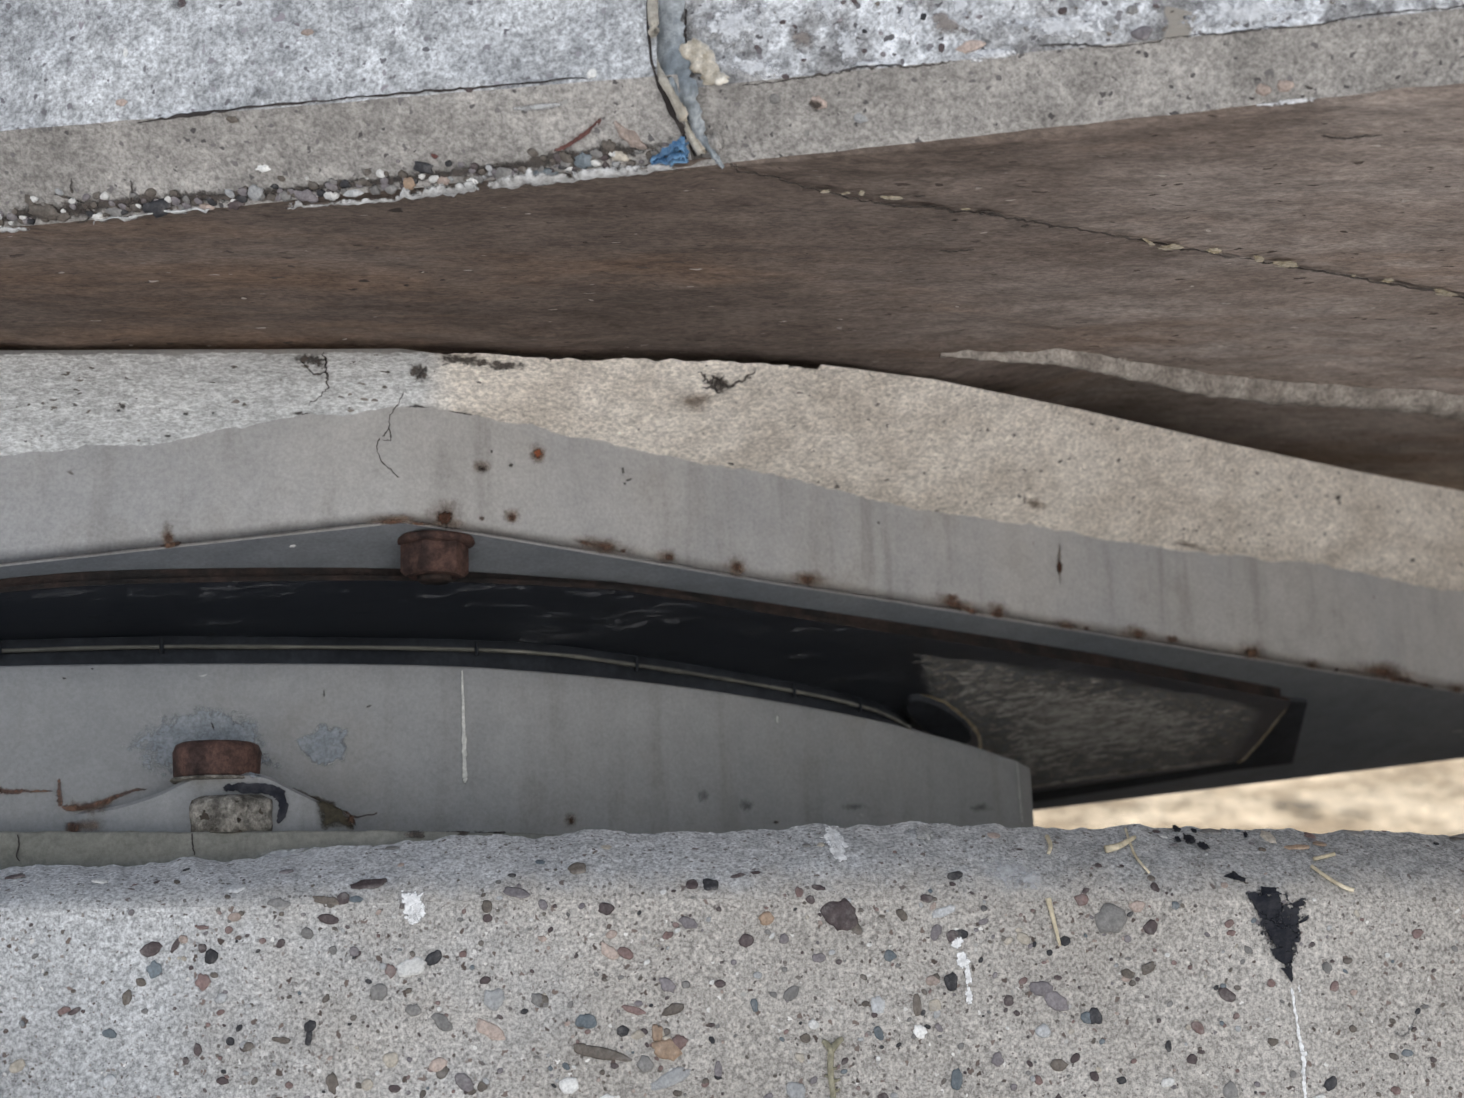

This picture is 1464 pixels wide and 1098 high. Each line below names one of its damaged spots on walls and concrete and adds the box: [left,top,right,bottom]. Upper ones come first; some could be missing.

crack [730,163,1464,299]
corrosion [0,779,146,832]
efflorescence [1291,985,1308,1098]